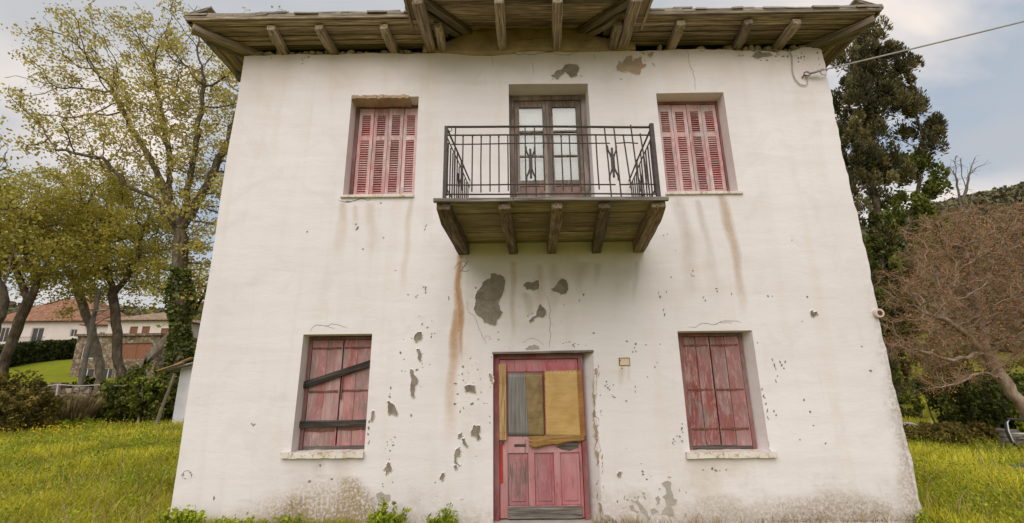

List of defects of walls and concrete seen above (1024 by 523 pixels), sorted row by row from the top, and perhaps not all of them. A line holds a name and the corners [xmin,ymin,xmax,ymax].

peeling [550,63,582,80]
flaking render [615,51,655,80]
rust [453,256,463,337]
peeling [473,273,540,350]
peeling [522,277,585,324]
peeling [400,323,435,399]
peeling [367,386,412,444]
flaking render [591,365,636,521]
peeling [617,463,687,520]